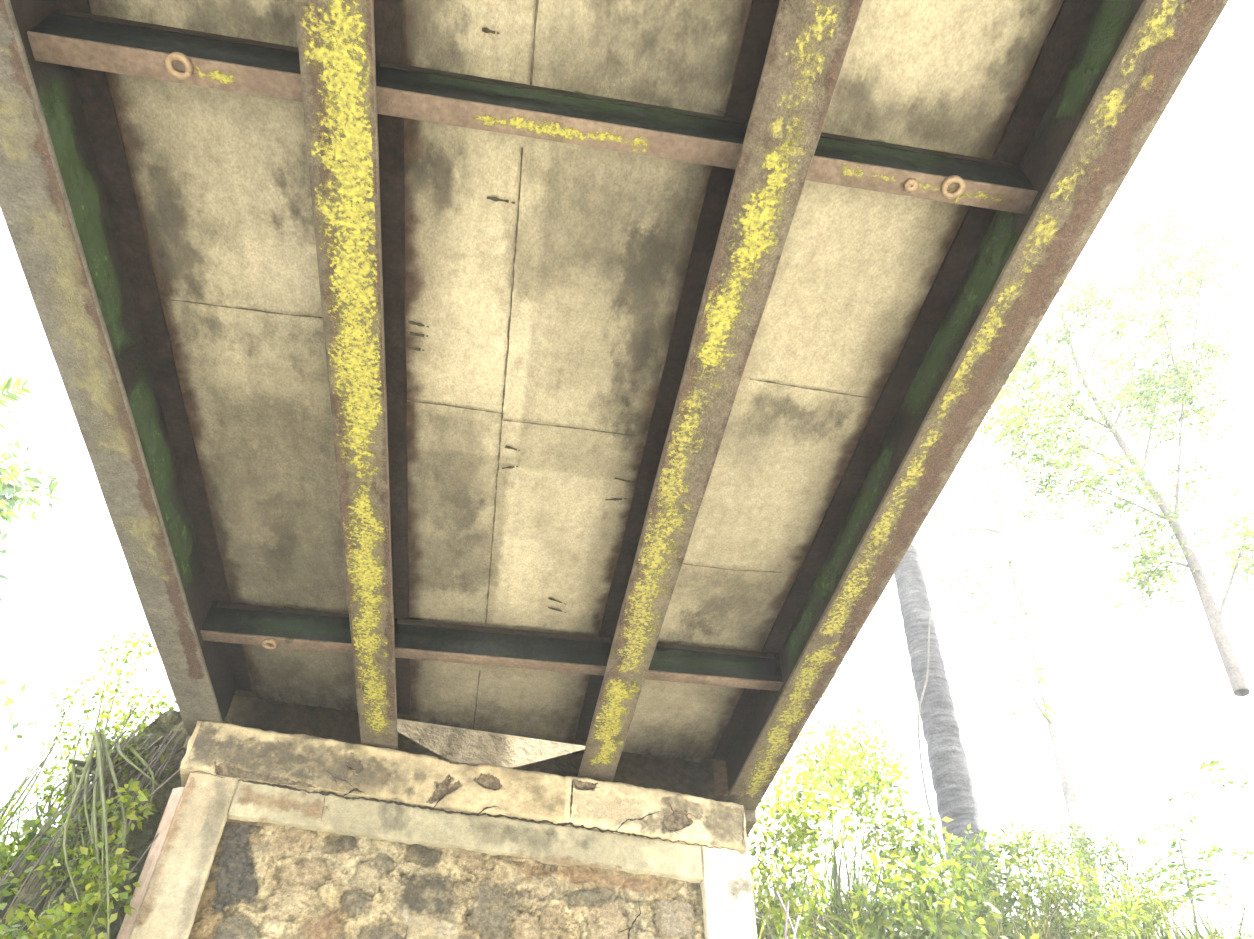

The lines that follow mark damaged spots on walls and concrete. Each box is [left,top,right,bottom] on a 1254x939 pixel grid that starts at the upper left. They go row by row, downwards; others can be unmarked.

corrosion [760,0,1224,795]
spalling [426,758,502,804]
crack [194,768,744,850]
spalling [661,808,694,832]